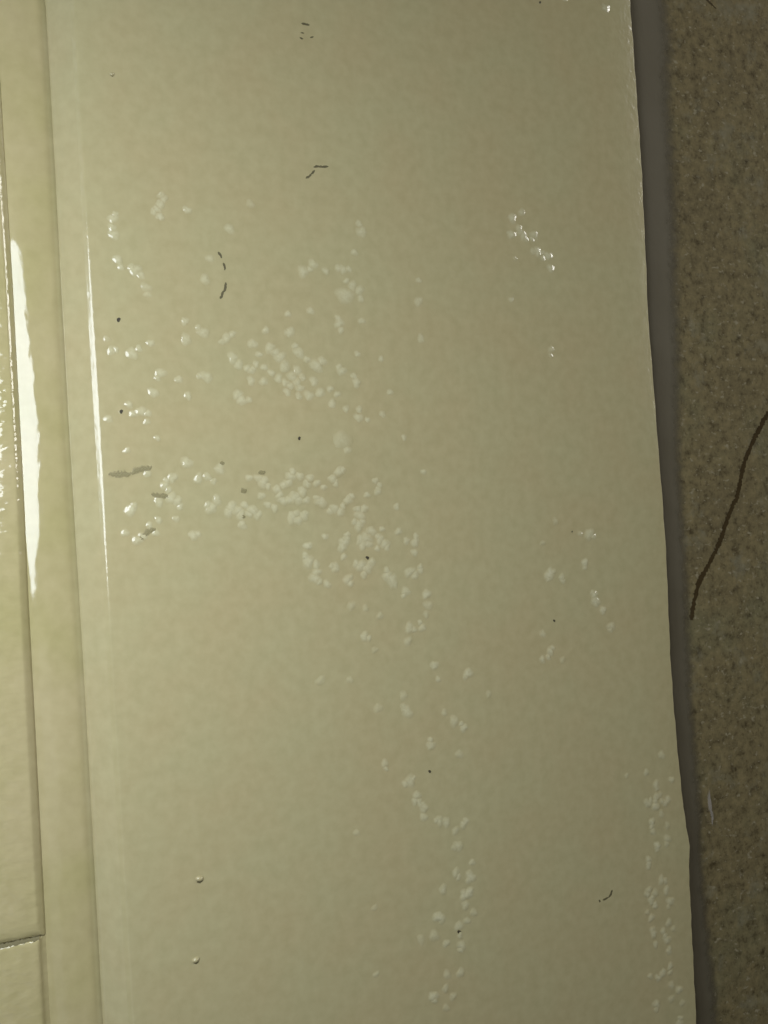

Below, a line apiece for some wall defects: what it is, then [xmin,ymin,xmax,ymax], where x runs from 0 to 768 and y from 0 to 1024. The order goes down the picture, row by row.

crack [689,411,768,620]